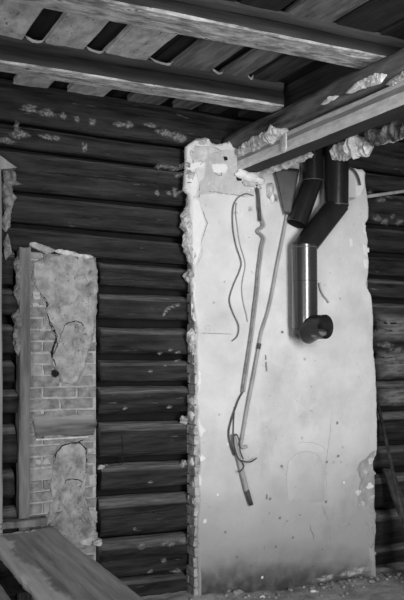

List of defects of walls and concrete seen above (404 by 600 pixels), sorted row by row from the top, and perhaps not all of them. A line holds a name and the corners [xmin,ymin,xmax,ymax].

spalling [29,242,93,259]
peeling [179,137,256,438]
flaking render [32,291,58,365]
crack [54,440,87,463]
flaking render [356,450,377,561]